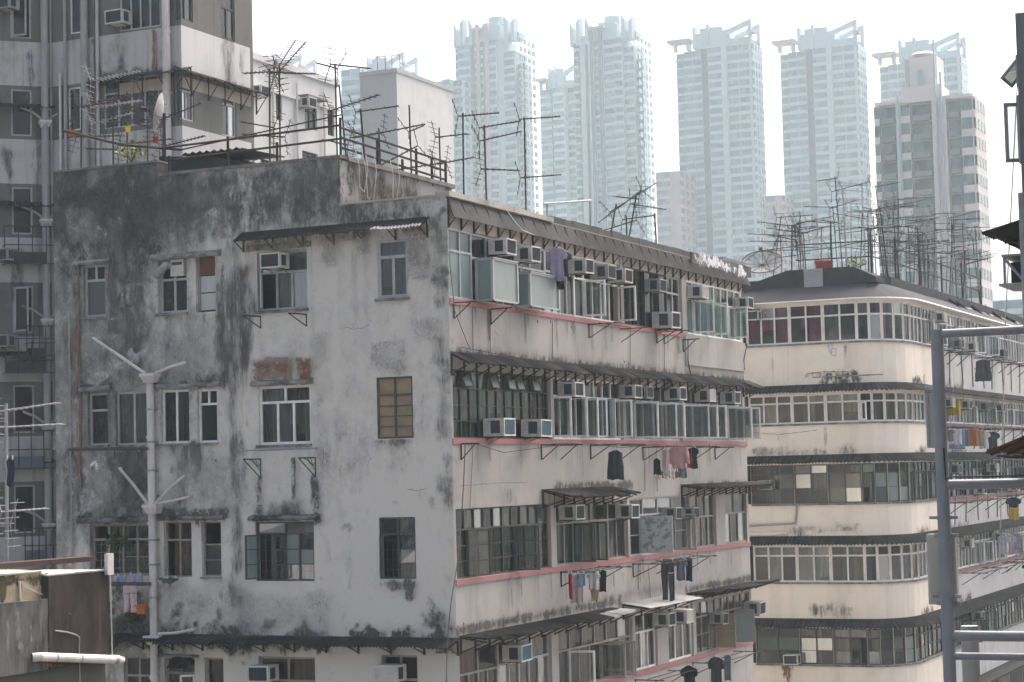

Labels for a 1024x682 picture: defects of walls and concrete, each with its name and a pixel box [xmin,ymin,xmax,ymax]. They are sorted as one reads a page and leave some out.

leakage [60,159,445,379]
leakage [203,245,256,486]
leakage [107,445,148,515]
leakage [193,506,242,636]
leakage [231,619,330,655]
leakage [389,579,413,601]